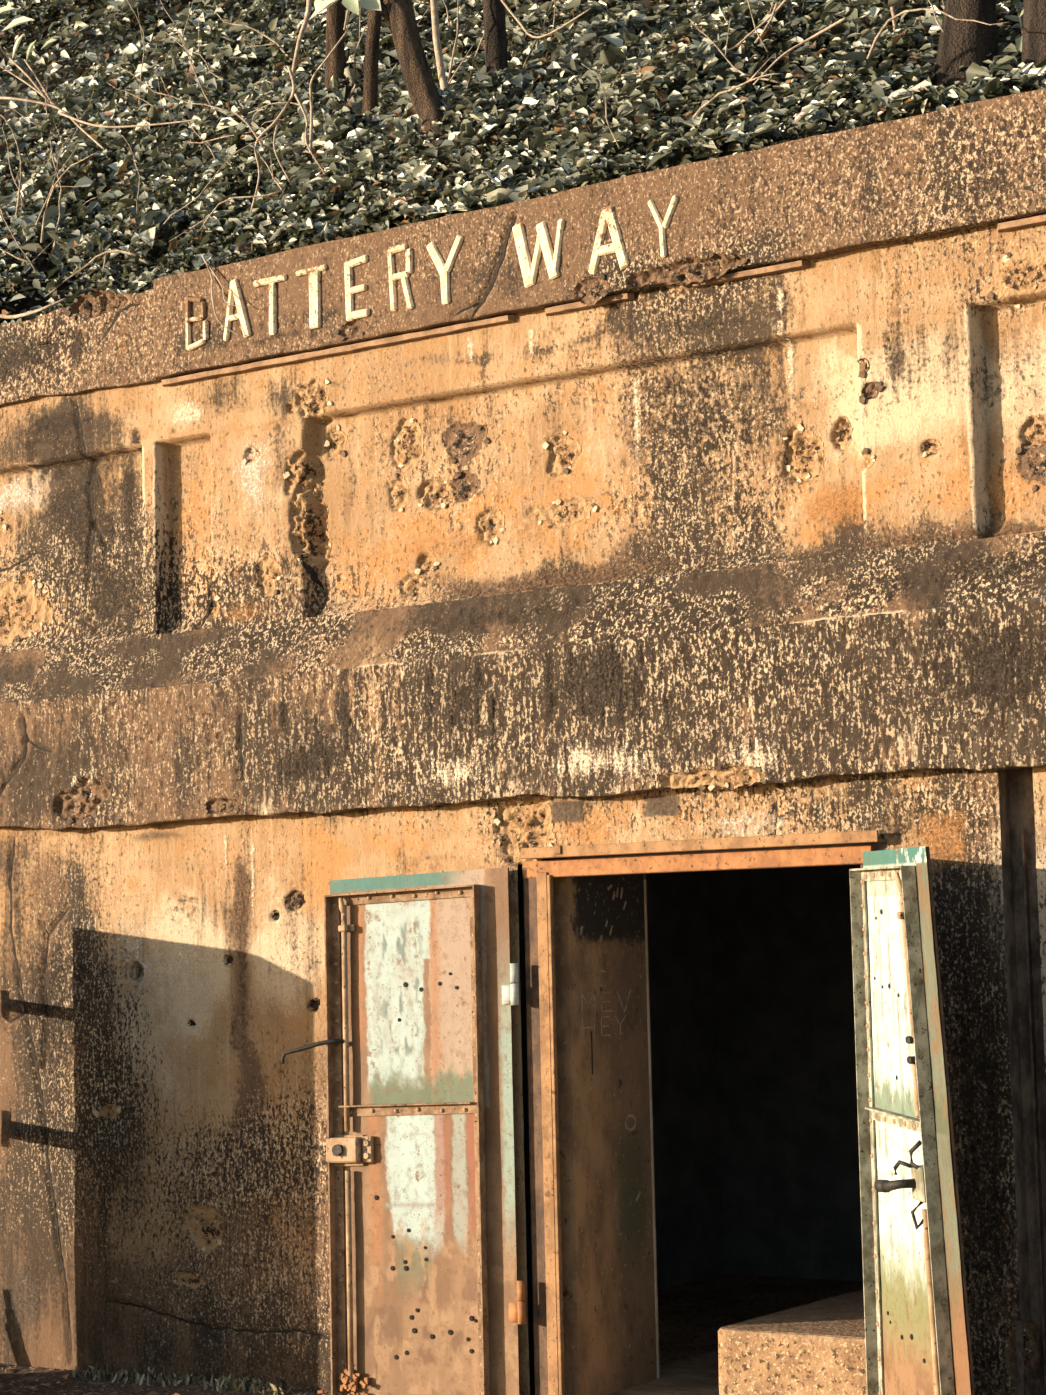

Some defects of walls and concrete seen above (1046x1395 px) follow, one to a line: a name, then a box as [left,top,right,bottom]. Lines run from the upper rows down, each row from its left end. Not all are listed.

spalling [257,376,347,598]
spalling [386,415,490,512]
damp [633,355,750,492]
spalling [1015,414,1046,492]
crack [0,718,51,793]
spalling [52,776,111,825]
damp [424,663,493,786]
damp [542,644,672,777]
spalling [660,765,767,791]
damp [730,738,777,771]
crack [2,836,71,1354]
crack [108,1300,330,1340]